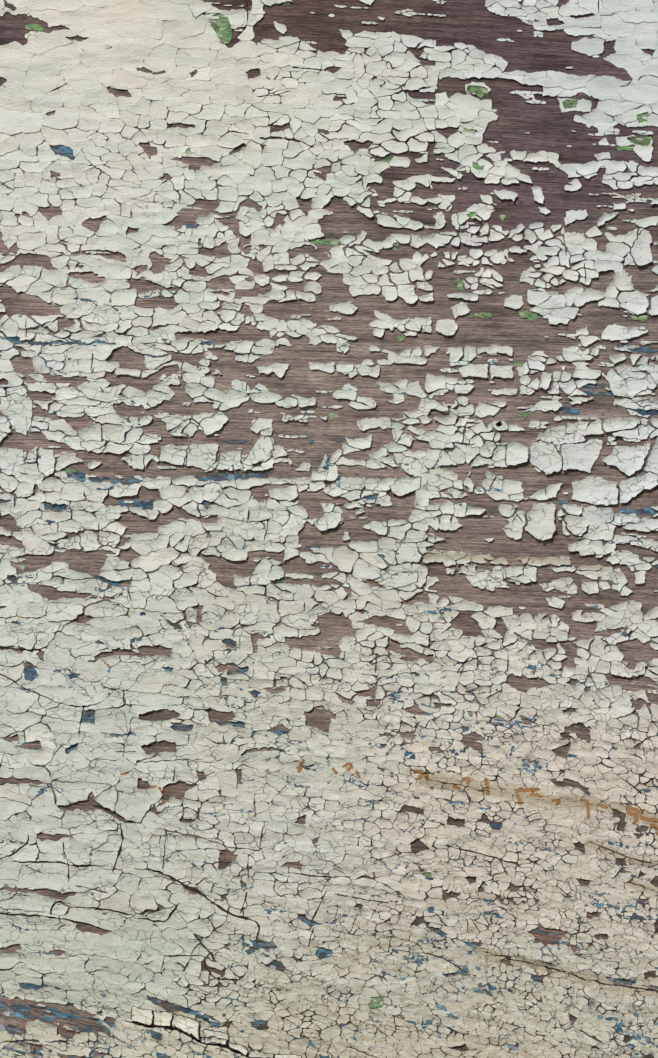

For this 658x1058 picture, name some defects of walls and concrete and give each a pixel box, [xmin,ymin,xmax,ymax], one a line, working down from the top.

crack [0,0,658,453]
peeling [0,0,658,765]
crack [0,361,658,1058]